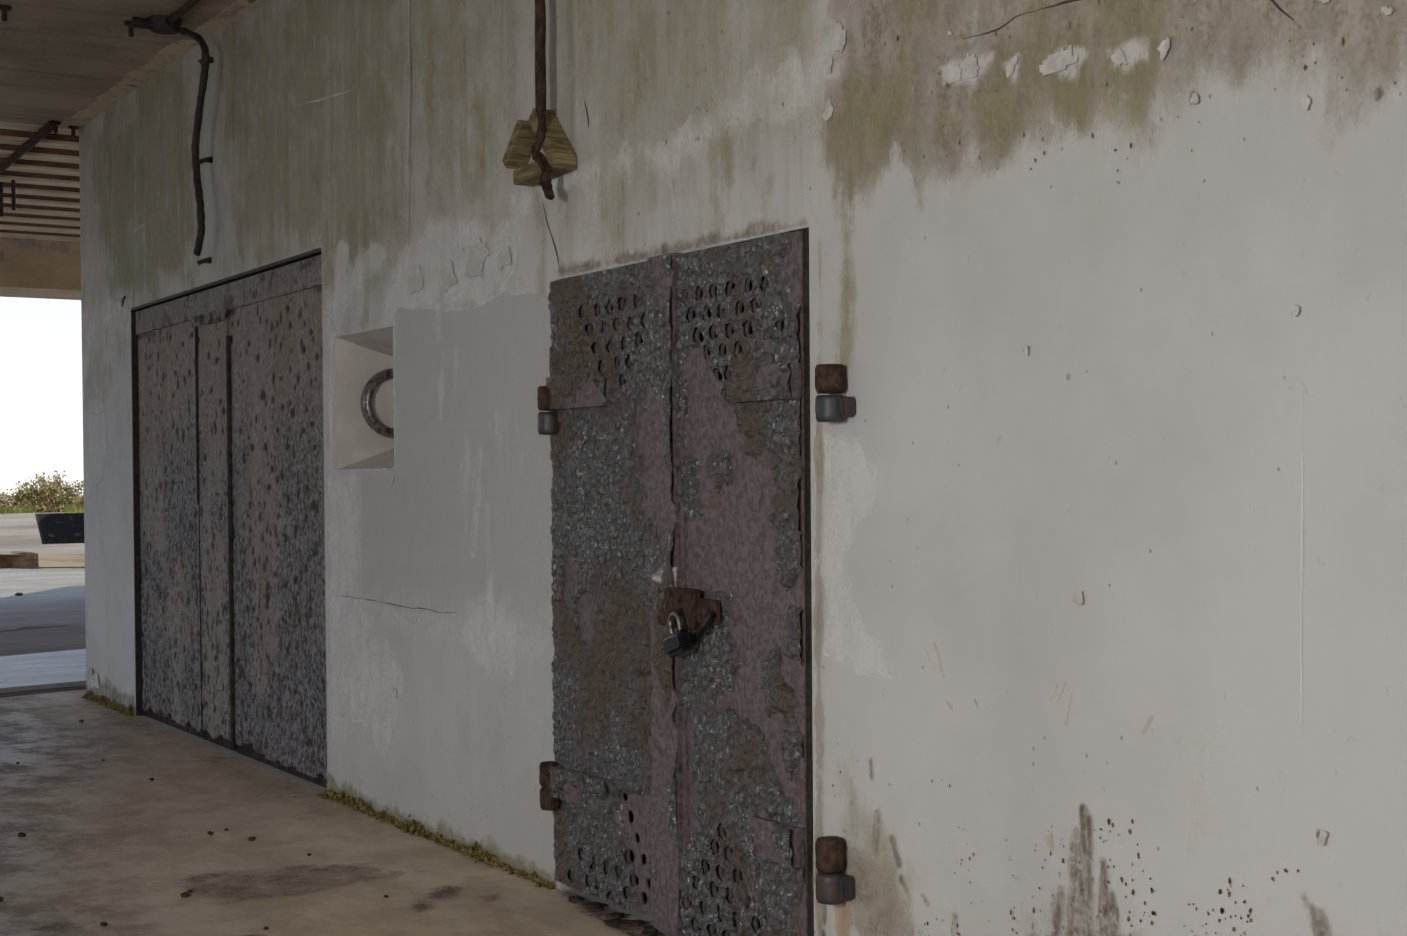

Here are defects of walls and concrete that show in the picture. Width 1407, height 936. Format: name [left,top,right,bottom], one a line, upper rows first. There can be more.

crack [964,0,1080,42]
crack [1271,0,1294,20]
peeling [943,53,989,84]
peeling [1006,55,1018,78]
peeling [1039,45,1085,76]
peeling [1111,37,1170,66]
water stain [794,0,1407,219]
water stain [559,222,780,275]
water stain [835,810,960,936]
water stain [1010,804,1156,936]
water stain [1184,878,1252,936]
water stain [1310,909,1328,936]